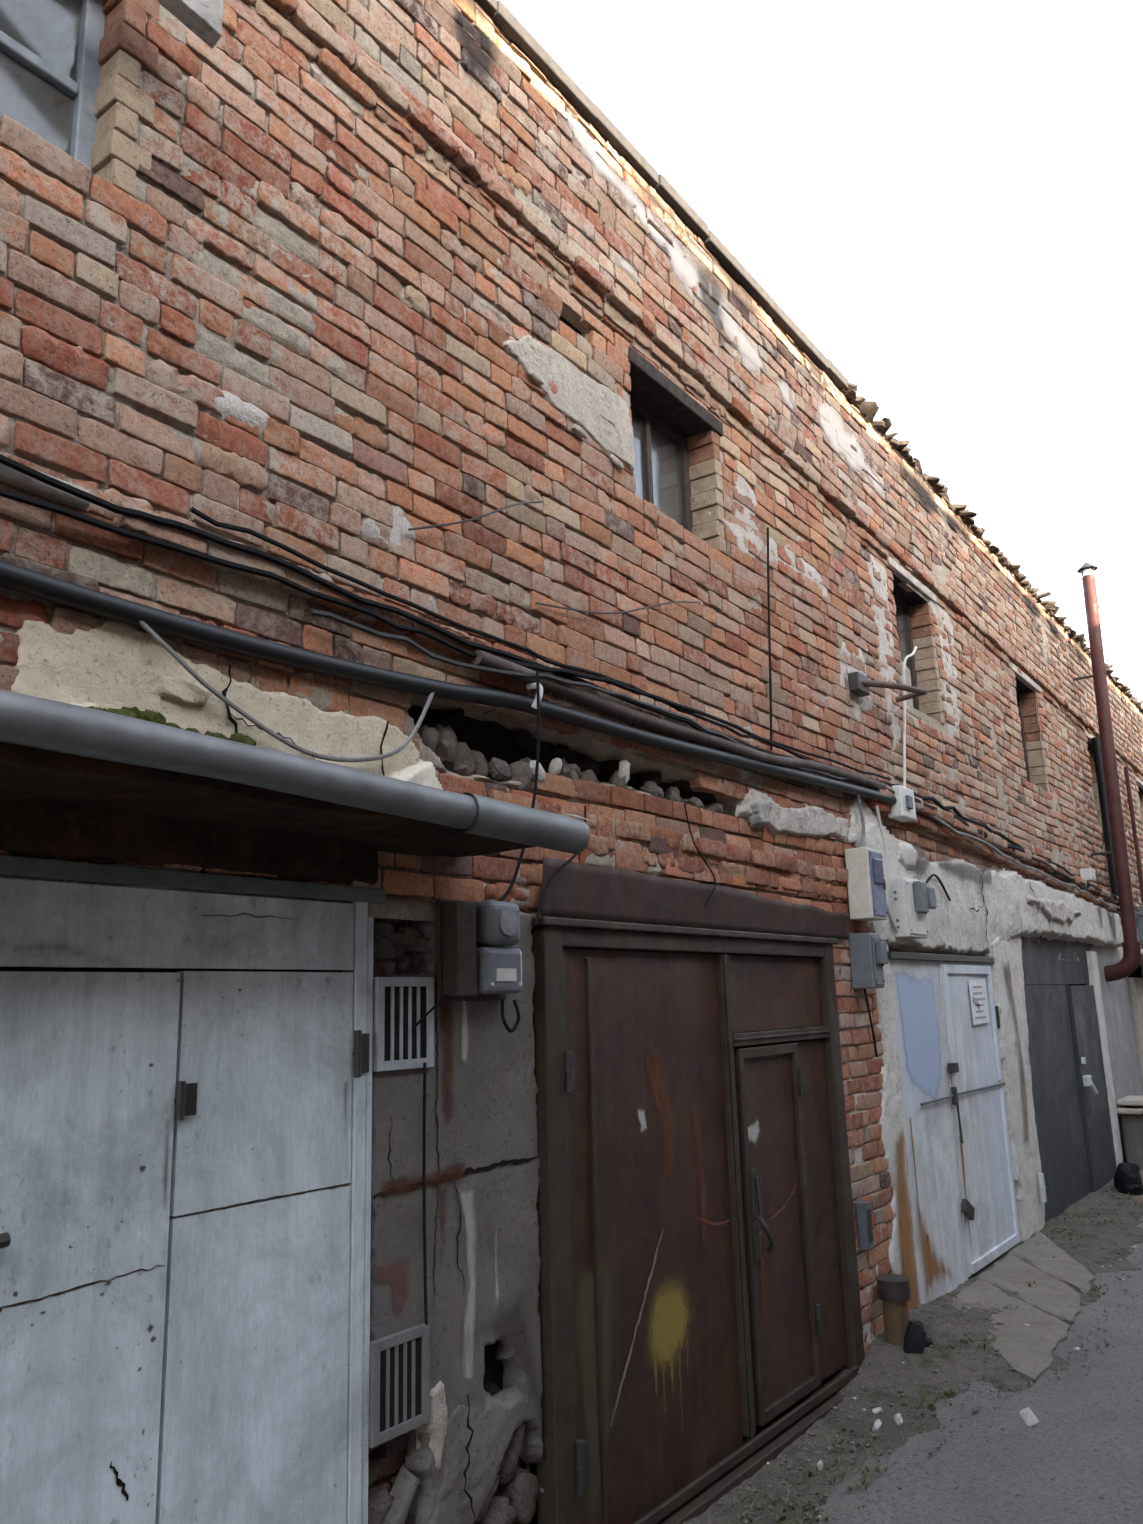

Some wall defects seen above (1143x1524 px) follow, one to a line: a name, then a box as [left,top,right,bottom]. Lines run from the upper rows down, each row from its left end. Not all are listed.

peeling [11,619,879,843]
crack [0,1265,164,1313]
crack [174,982,539,1307]
rust [897,1118,945,1310]